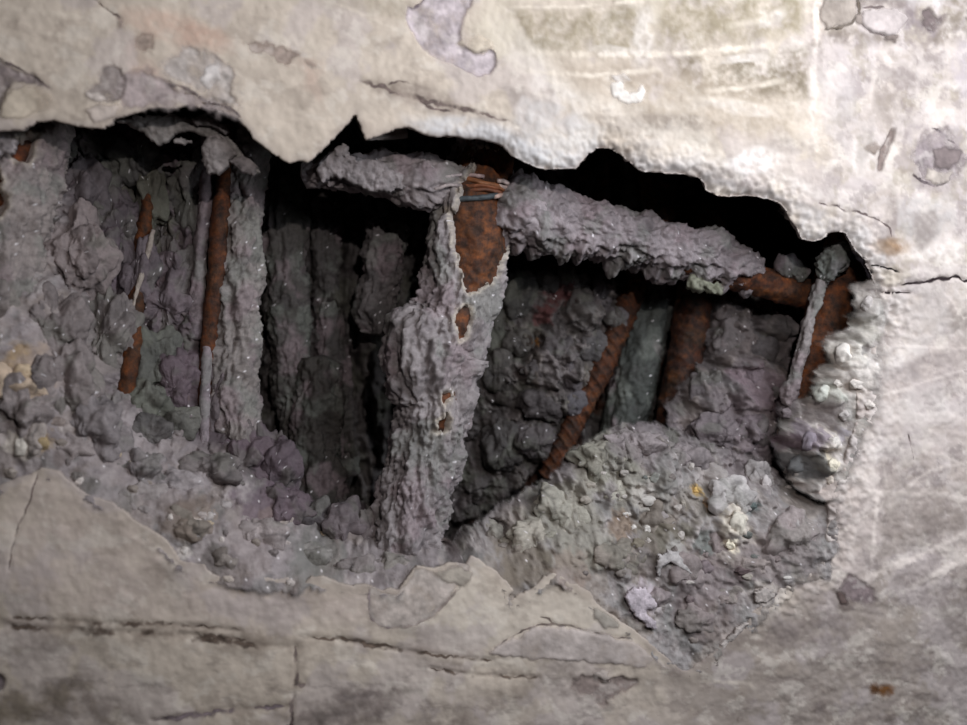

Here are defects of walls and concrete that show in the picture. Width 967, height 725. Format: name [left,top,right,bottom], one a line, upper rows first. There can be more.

spalling [406,0,496,77]
peeling [820,0,908,42]
spalling [922,8,942,31]
crack [365,81,493,118]
spalling [869,130,894,171]
spalling [912,128,966,185]
crack [853,252,967,294]
spalling [0,47,886,676]
rust [664,291,801,465]
crack [197,624,255,648]
crack [483,617,627,679]
crack [164,636,456,725]